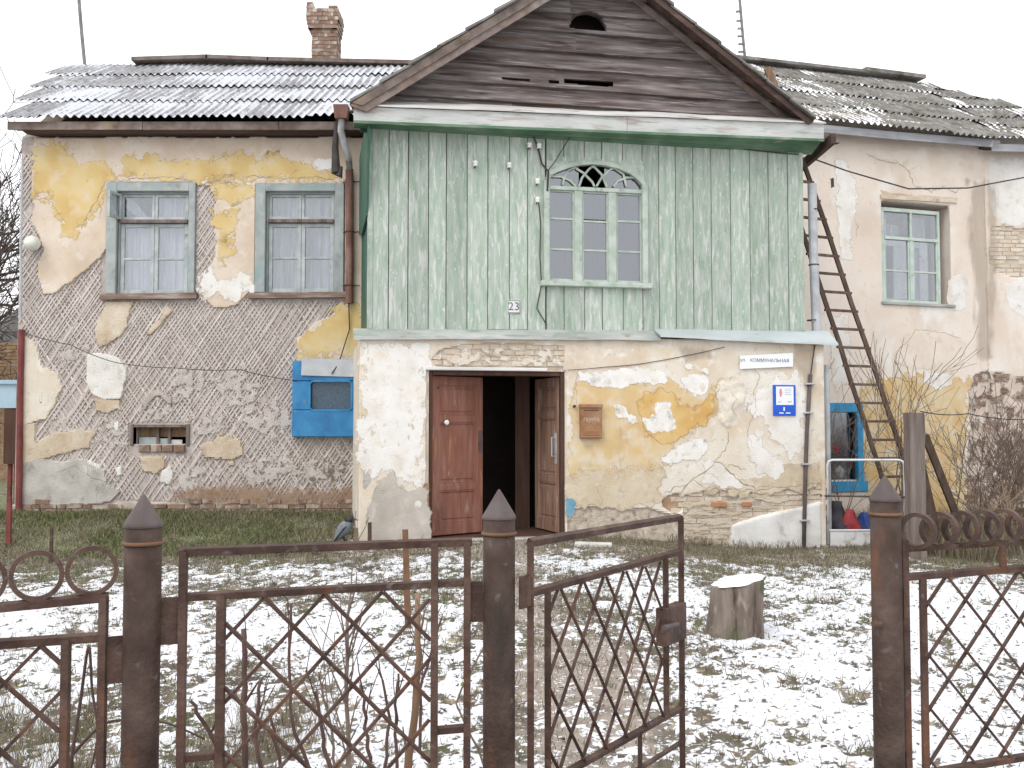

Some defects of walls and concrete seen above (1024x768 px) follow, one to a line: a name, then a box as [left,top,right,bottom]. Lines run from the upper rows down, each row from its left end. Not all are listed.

peeling [29,139,345,267]
peeling [830,158,859,261]
flaking render [989,226,1024,278]
peeling [295,299,361,360]
flaking render [431,343,564,368]
peeling [564,363,829,546]
crack [663,368,819,501]
peeling [856,324,1024,518]